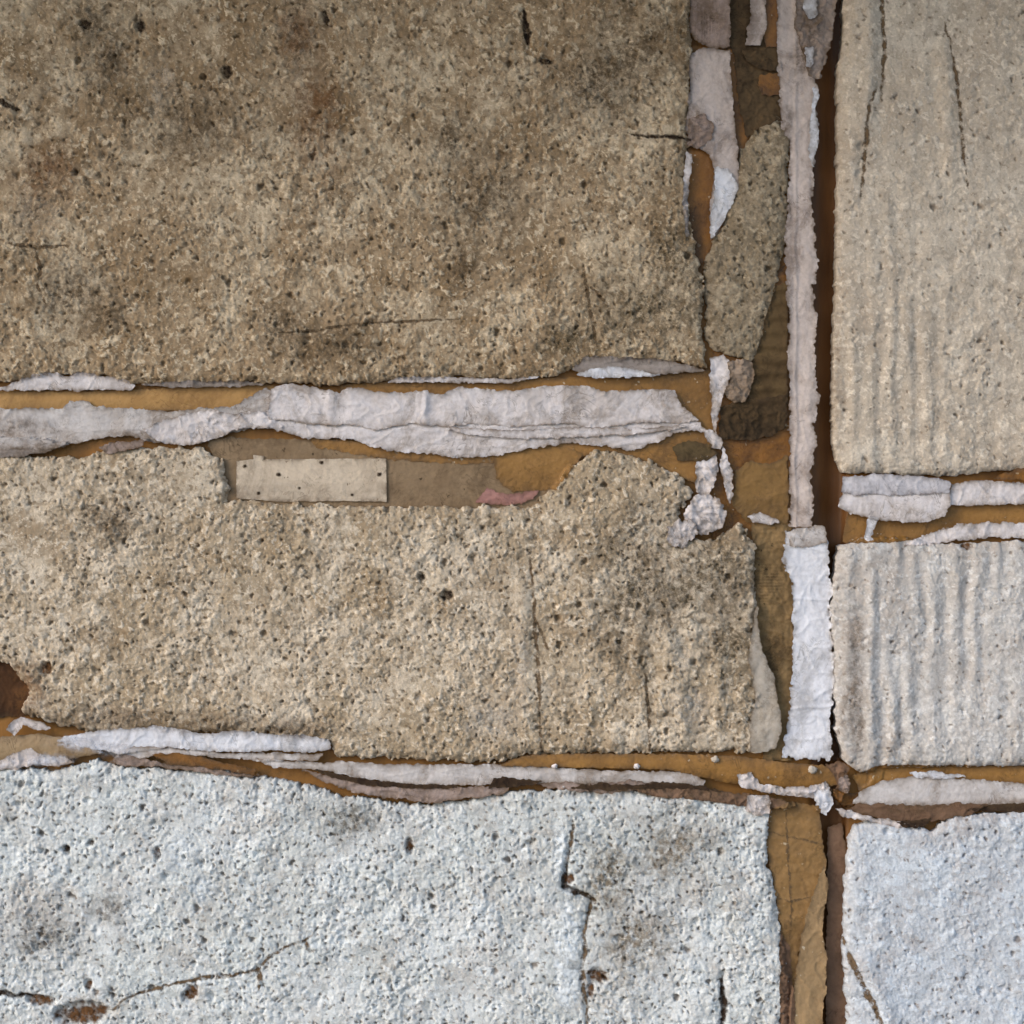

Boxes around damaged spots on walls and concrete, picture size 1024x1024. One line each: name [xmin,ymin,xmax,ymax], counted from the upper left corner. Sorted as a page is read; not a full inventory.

peeling [682,0,739,240]
crack [860,0,887,197]
crack [944,24,969,187]
peeling [0,355,755,549]
peeling [745,0,838,762]
peeling [838,473,1024,550]
crack [530,560,549,748]
peeling [57,725,1024,829]
crack [0,990,35,998]
crack [112,927,318,1011]
crack [561,821,596,1024]